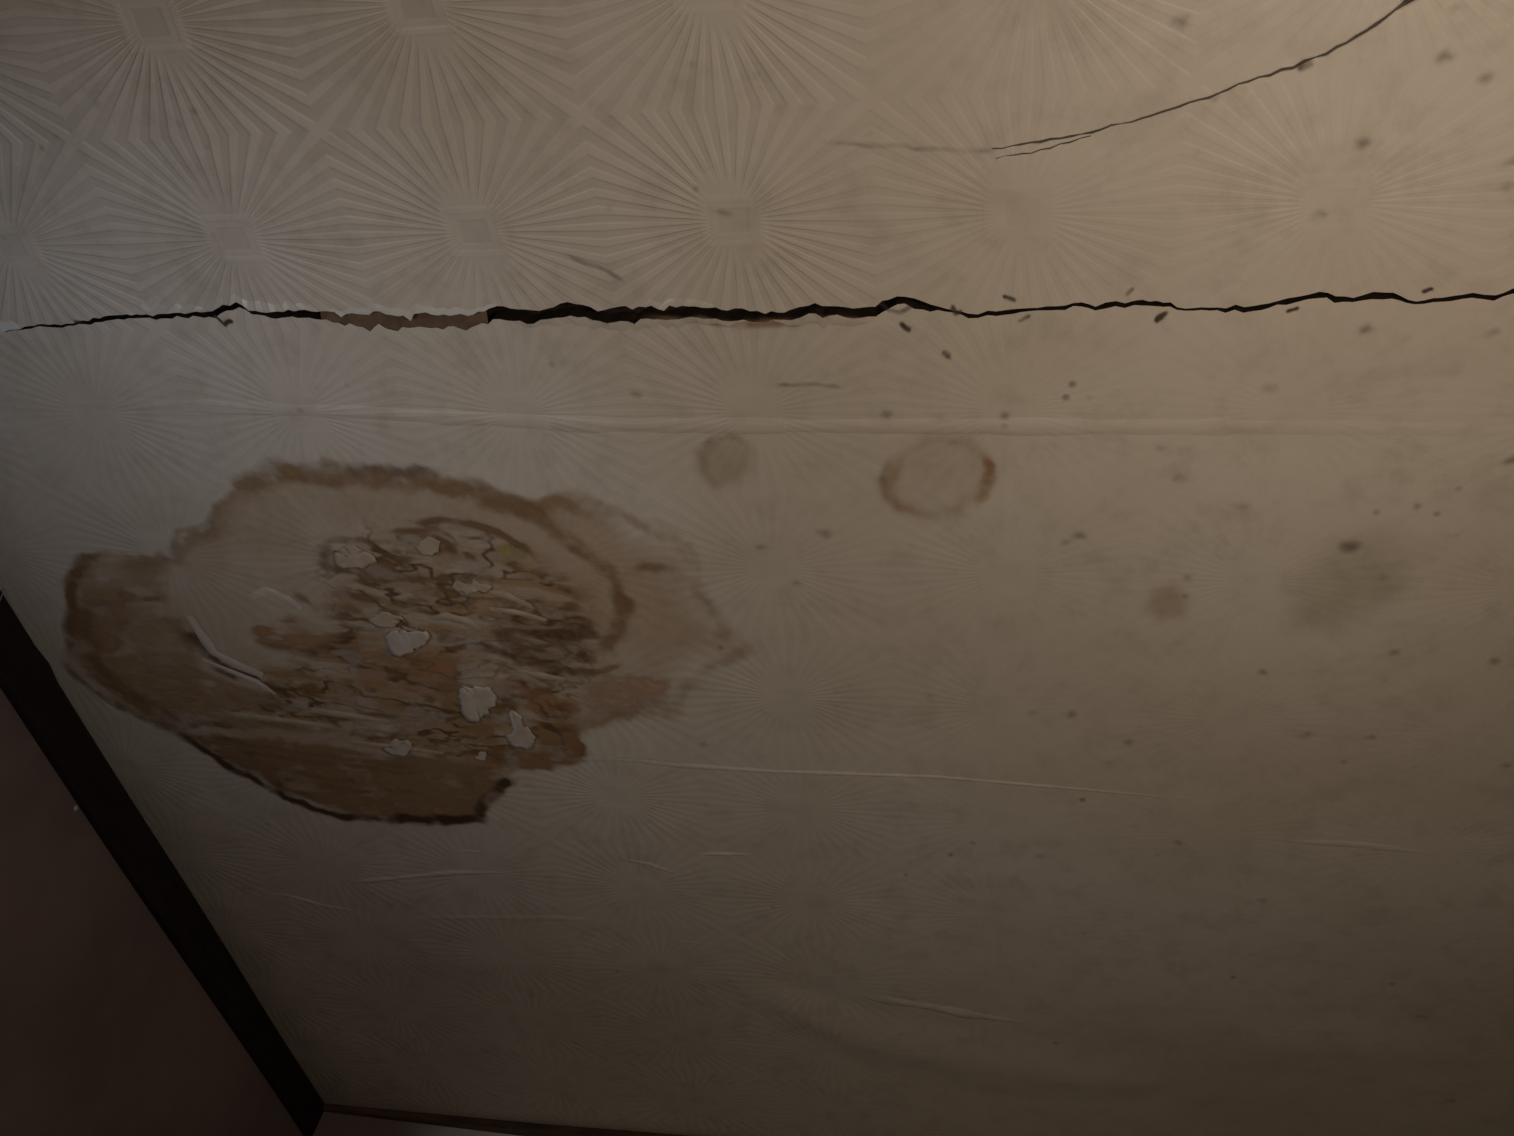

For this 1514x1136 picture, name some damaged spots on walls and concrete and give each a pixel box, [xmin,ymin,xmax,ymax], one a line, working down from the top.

crack [992,0,1420,159]
crack [0,288,1514,333]
leakage [64,464,667,826]